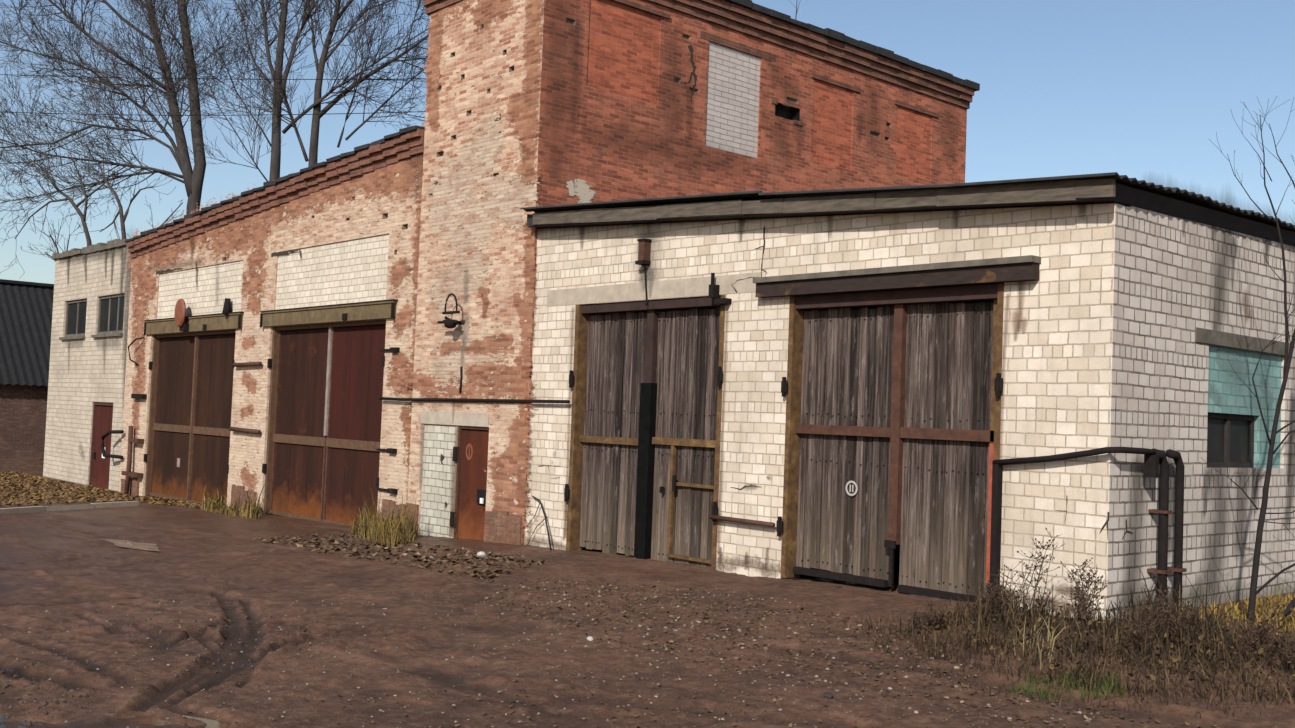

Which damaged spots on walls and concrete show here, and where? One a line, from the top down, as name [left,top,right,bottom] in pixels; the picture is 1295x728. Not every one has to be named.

peeling [127,0,546,533]